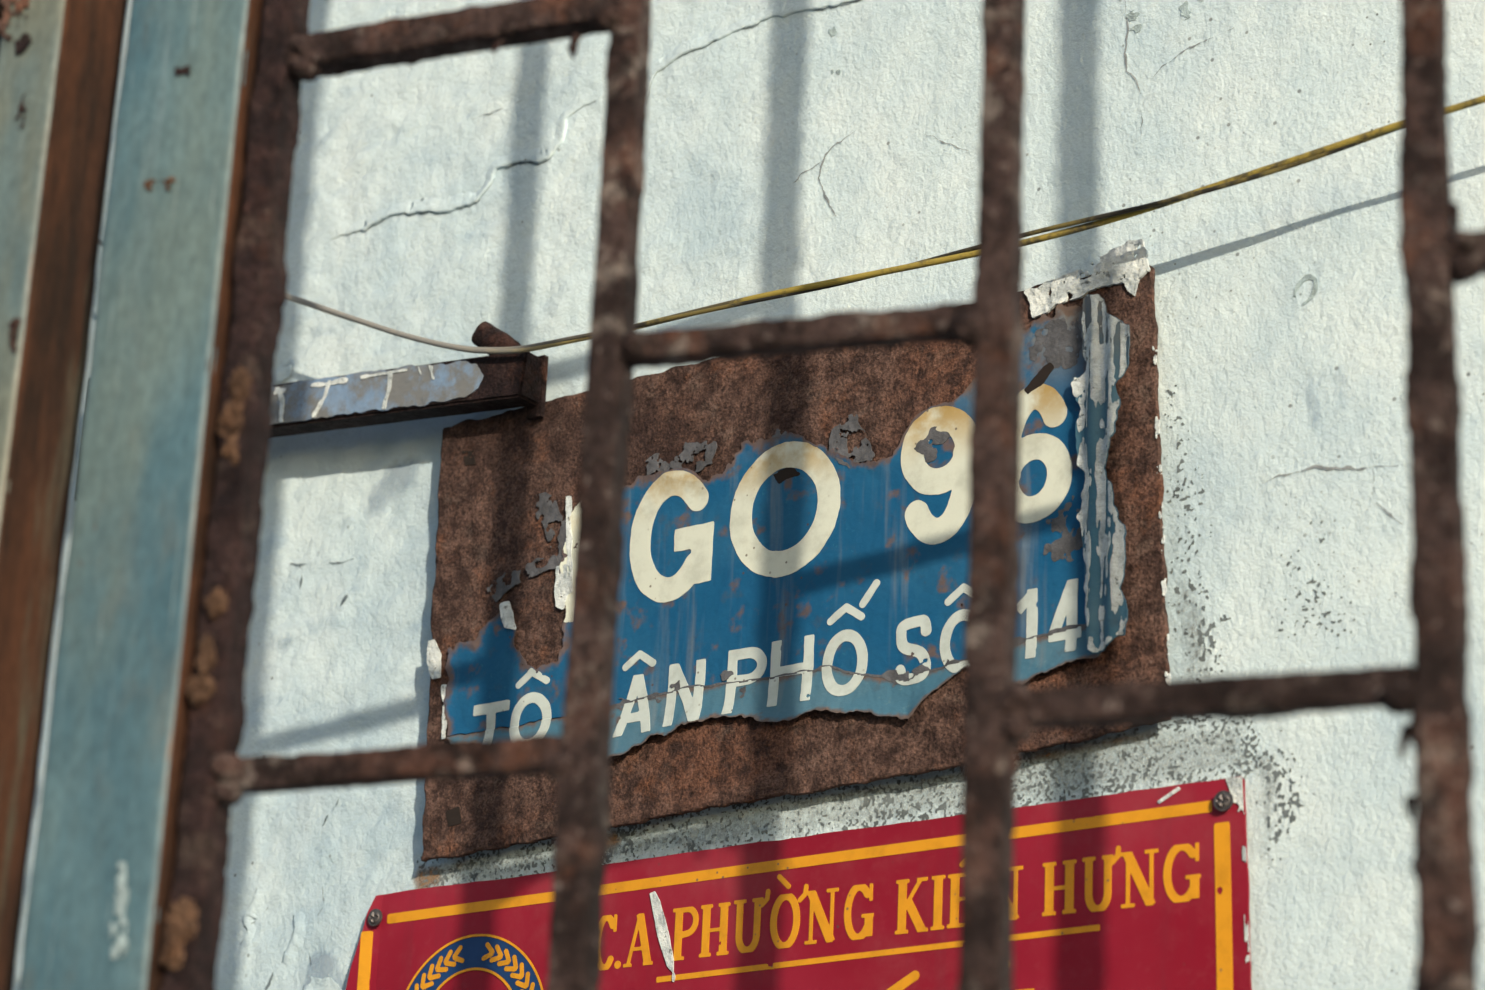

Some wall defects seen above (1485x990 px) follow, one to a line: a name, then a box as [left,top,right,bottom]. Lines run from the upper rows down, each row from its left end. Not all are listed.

crack [648,0,860,97]
crack [330,90,596,240]
crack [795,131,855,216]
peeling [306,956,342,990]